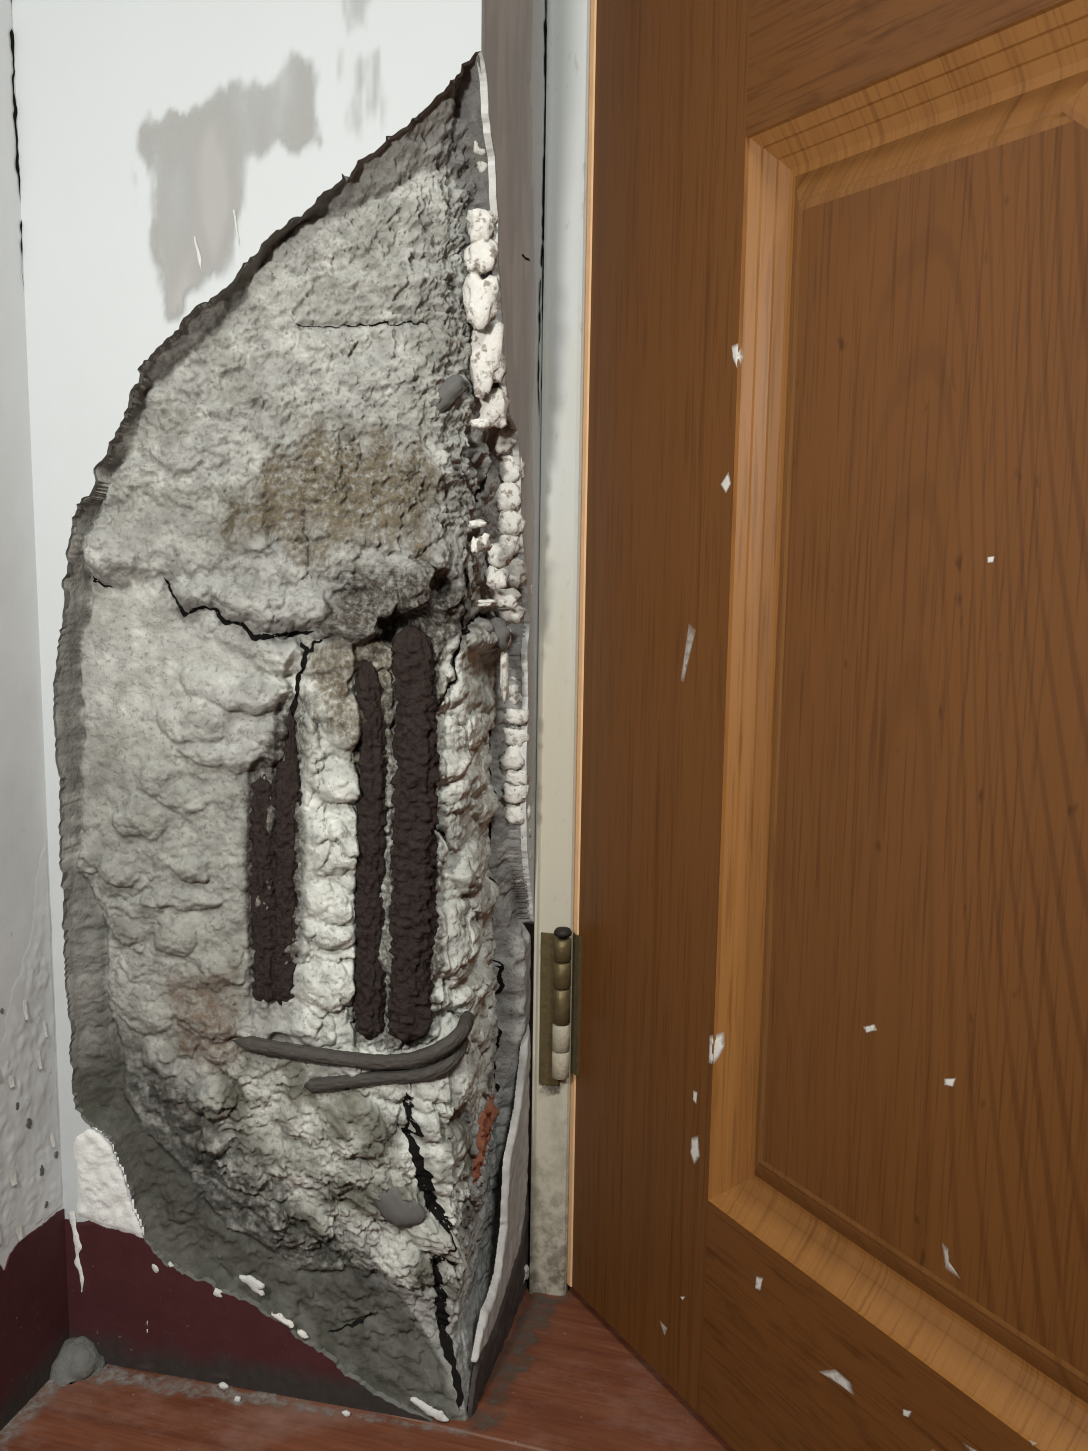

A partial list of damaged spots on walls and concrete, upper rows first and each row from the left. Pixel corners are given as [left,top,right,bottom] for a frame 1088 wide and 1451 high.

crack [10,0,24,285]
spalling [55,0,535,1422]
rust [221,429,468,1047]
peeling [8,1075,32,1128]
peeling [40,1131,58,1176]
crack [401,1092,464,1410]